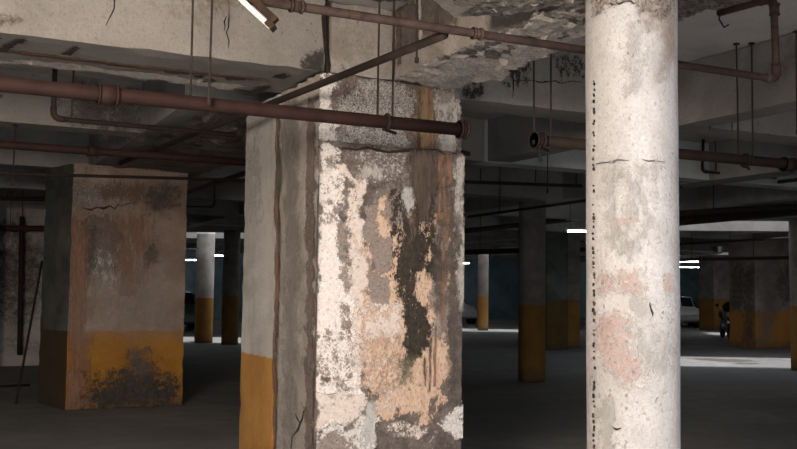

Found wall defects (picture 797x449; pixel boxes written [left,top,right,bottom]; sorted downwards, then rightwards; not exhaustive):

spalling [307,0,752,123]
water stain [79,347,181,410]
peeling [301,121,465,449]
water stain [333,145,449,374]
crack [508,71,663,449]
peeling [593,214,679,393]